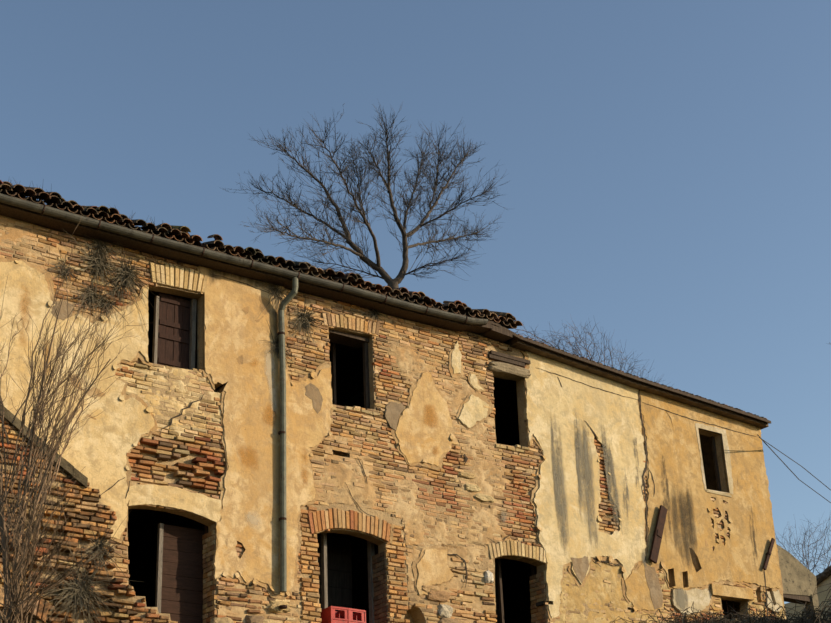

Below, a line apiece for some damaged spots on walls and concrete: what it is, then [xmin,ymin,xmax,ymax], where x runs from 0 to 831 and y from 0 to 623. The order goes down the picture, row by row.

flaking render [0,218,196,321]
flaking render [108,528,130,586]
flaking render [112,358,226,499]
flaking render [285,290,546,623]
leakage [551,430,567,542]
leakage [575,421,597,538]
flaking render [594,436,622,534]
leakage [602,434,639,522]
flaking render [536,555,724,623]
crack [535,367,756,546]
leakage [663,465,695,553]
flaking render [724,580,786,619]